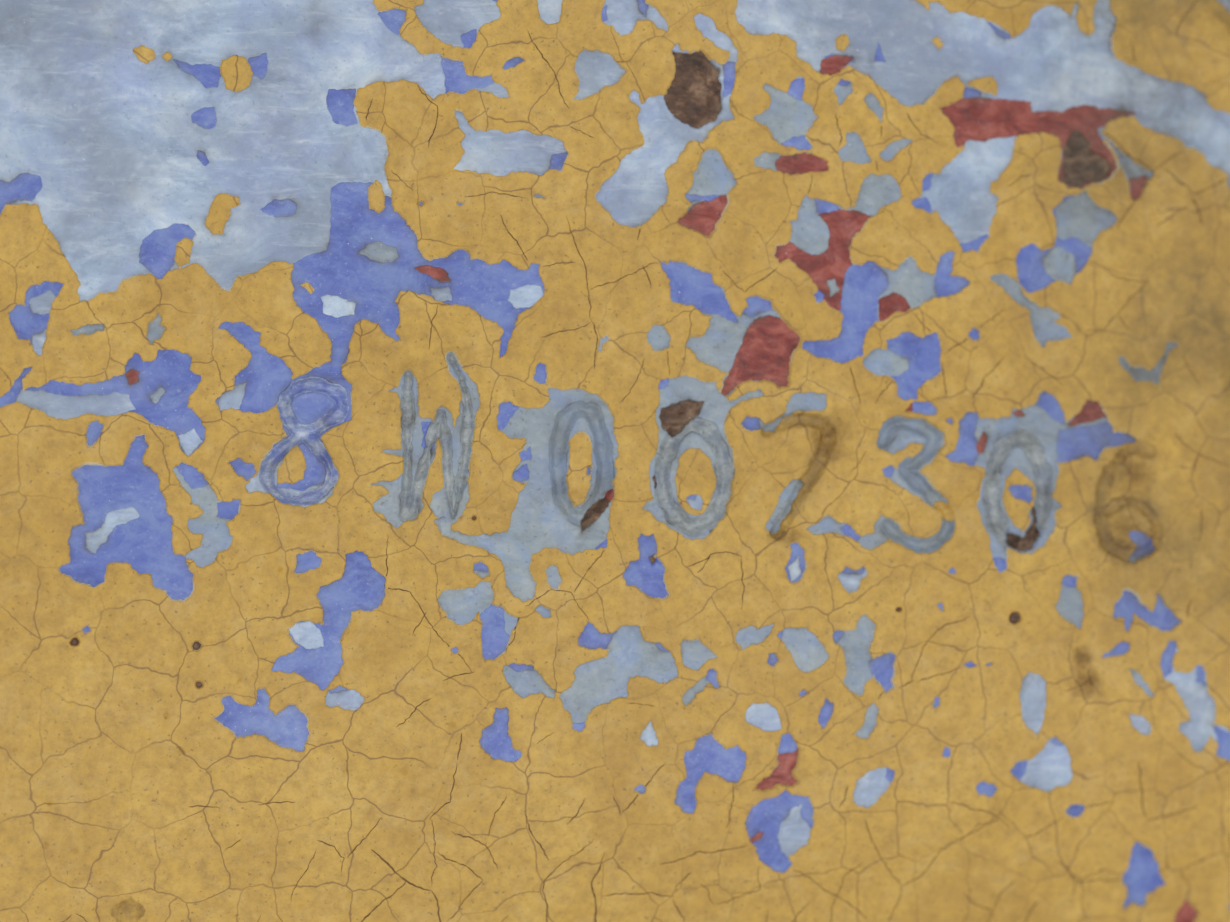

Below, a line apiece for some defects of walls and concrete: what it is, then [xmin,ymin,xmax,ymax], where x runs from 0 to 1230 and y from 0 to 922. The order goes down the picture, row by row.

crack [417,85,438,148]
crack [528,32,594,138]
peeling [596,13,738,237]
peeling [0,0,545,600]
crack [467,192,653,368]
peeling [622,0,1230,598]
peeling [271,551,386,711]
crack [386,540,473,727]
peeling [371,358,719,731]
crack [506,550,605,650]
crack [291,733,1120,922]
peeling [745,702,814,873]